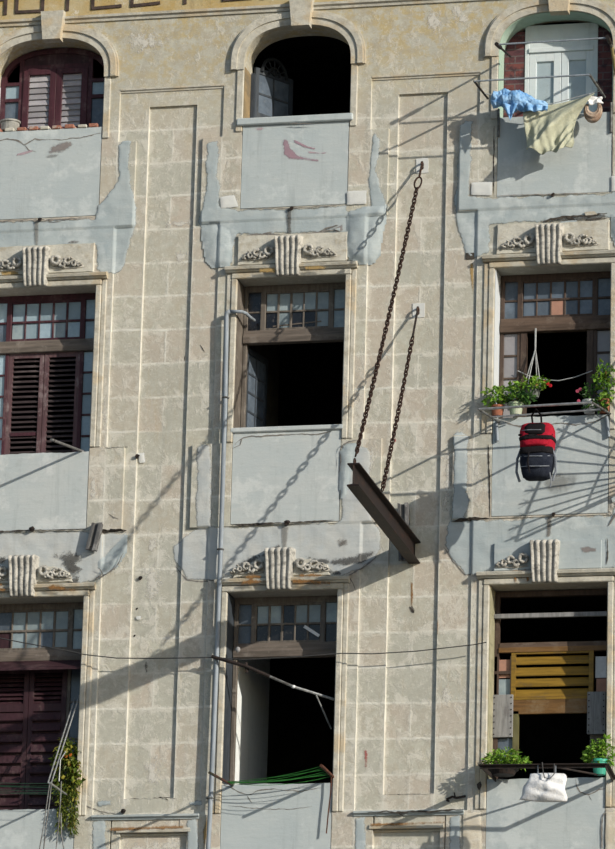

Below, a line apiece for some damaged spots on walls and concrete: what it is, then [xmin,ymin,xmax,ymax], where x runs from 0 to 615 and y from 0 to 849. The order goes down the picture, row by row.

flaking render [504,32,525,92]
crack [0,133,99,151]
spalling [549,211,605,223]
water stain [54,553,82,583]
crack [224,785,317,810]